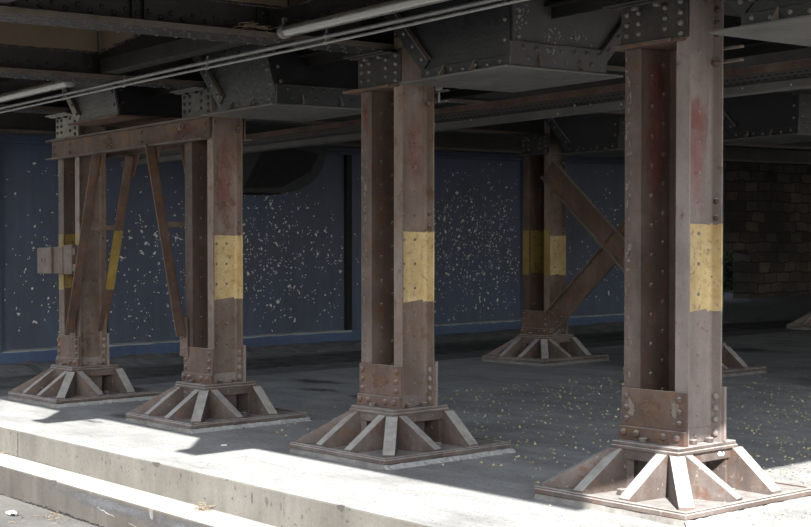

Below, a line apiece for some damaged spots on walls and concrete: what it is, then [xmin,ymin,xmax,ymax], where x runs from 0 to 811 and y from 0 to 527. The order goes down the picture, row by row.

peeling [118,211,168,328]
peeling [243,193,343,332]
peeling [434,172,519,321]